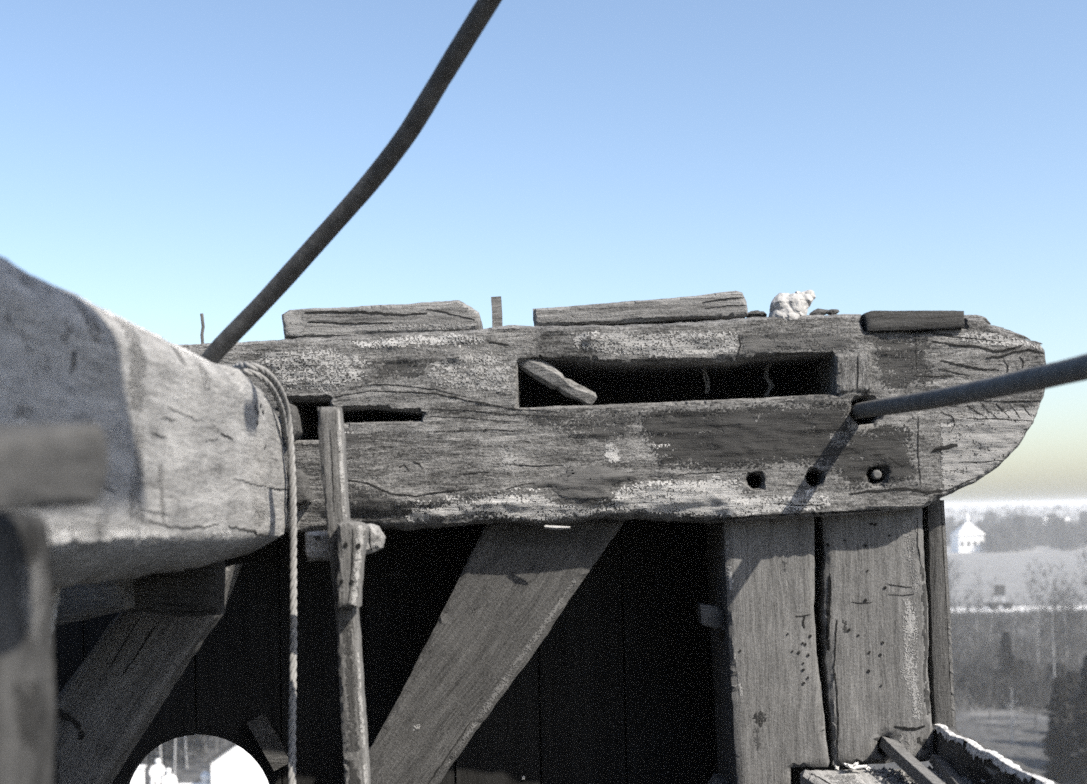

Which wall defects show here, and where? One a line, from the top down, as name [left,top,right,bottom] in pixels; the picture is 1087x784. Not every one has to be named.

crack [913,331,1044,377]
crack [707,400,1041,521]
crack [796,522,925,784]